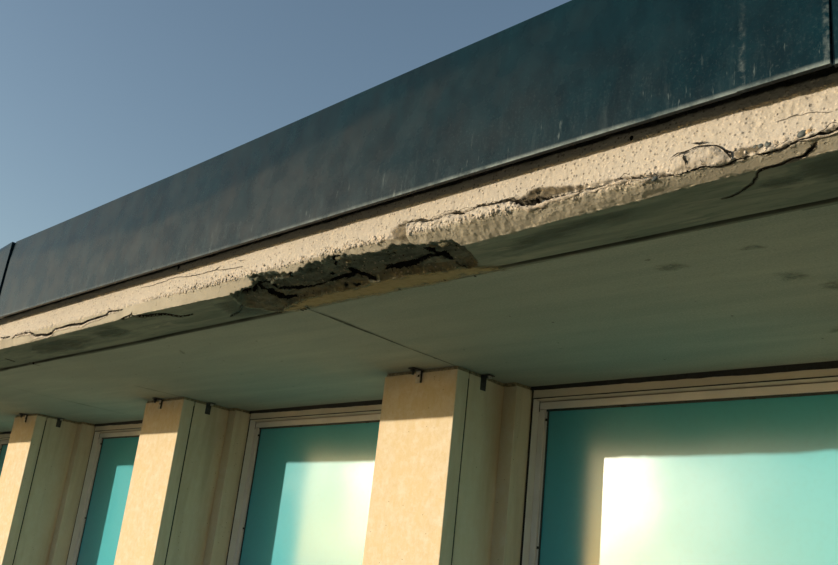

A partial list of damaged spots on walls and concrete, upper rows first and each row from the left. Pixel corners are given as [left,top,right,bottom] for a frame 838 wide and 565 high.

crack [400,111,838,227]
spalling [143,204,513,312]
crack [0,308,193,340]